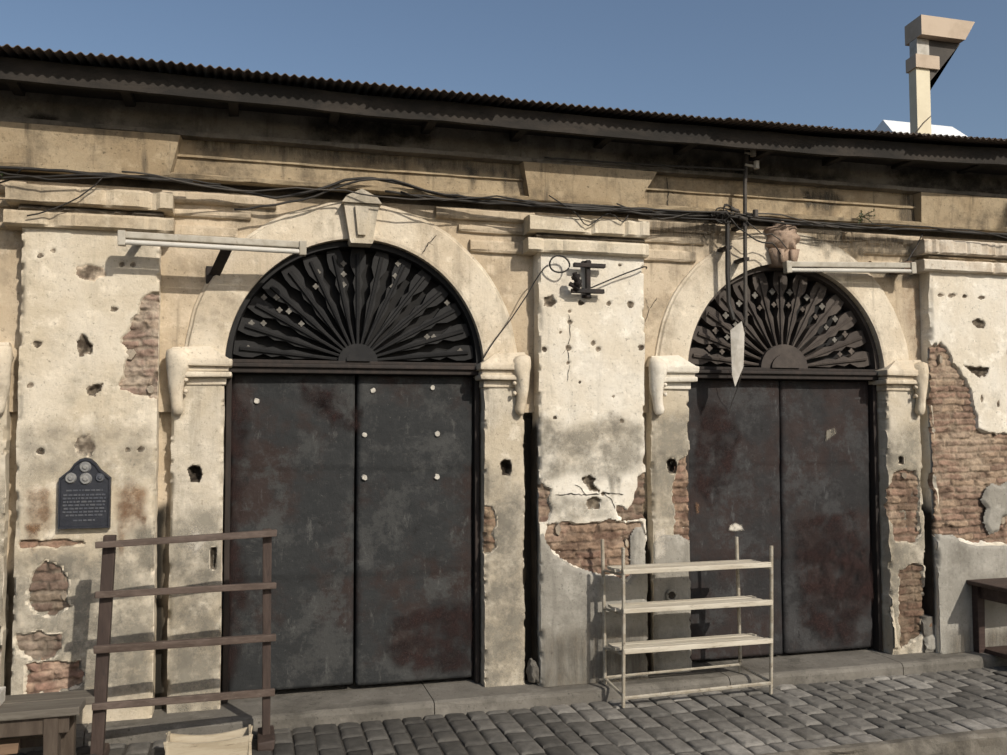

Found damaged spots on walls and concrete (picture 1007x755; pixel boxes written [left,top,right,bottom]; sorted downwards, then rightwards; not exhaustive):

leakage [314,119,426,165]
leakage [623,153,842,210]
leakage [896,168,1007,221]
spalling [119,294,159,399]
spalling [884,344,1007,544]
spalling [29,561,70,615]
leakage [485,413,687,687]
crack [556,485,623,507]
spalling [537,473,645,579]
spalling [672,457,689,540]
spalling [898,563,932,649]
spalling [16,630,84,694]